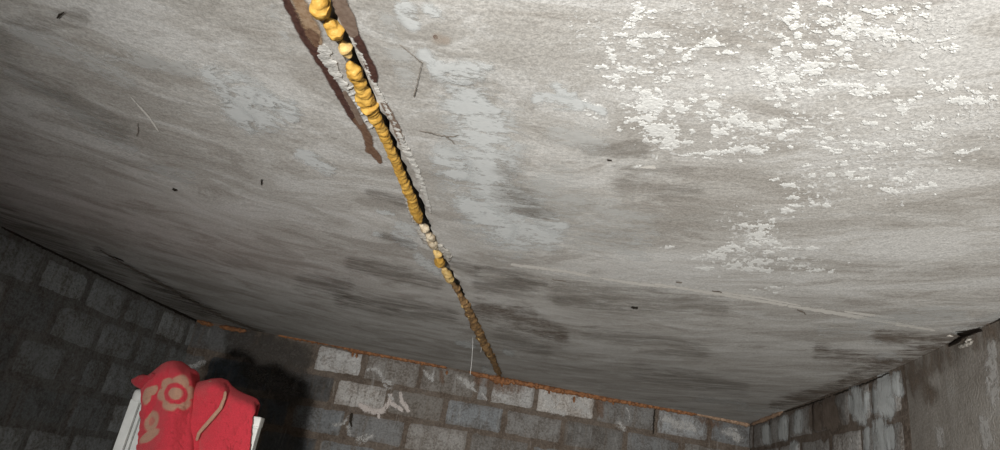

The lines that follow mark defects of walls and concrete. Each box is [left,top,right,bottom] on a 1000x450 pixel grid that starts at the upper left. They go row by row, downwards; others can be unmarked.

corrosion [282,0,382,164]
crack [419,130,458,144]